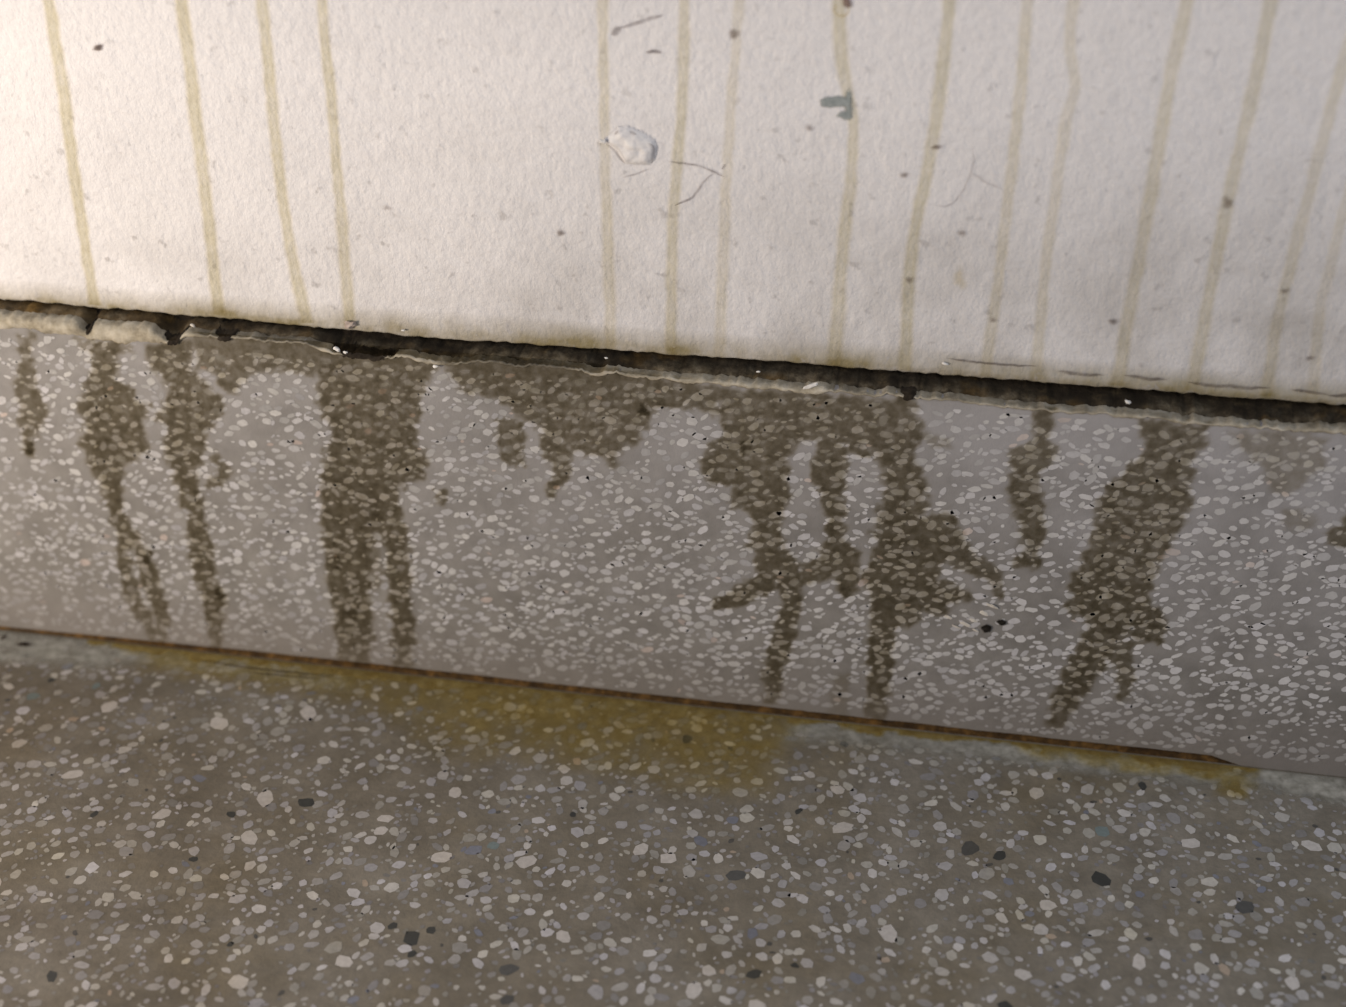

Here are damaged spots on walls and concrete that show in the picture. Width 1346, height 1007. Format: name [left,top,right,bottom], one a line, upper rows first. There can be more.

efflorescence [0,631,135,662]
water stain [180,470,225,614]
water stain [319,342,437,627]
water stain [636,383,674,416]
water stain [705,393,802,535]
water stain [816,396,957,605]
water stain [1066,488,1158,702]
water stain [789,722,1346,804]